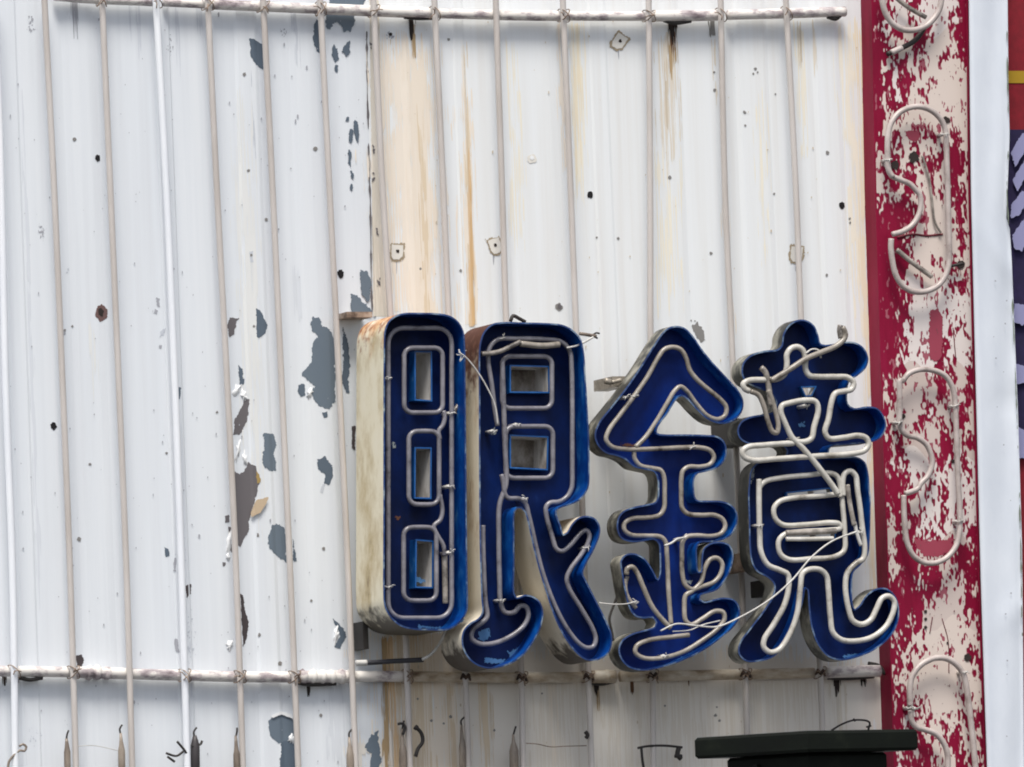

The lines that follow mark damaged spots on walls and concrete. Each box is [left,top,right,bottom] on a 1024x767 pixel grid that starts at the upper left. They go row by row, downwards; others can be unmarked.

peeling [249,38,263,69]
peeling [313,0,365,72]
rust [663,21,692,79]
peeling [346,117,359,191]
rust [459,42,501,326]
peeling [256,308,268,338]
peeling [298,317,351,418]
peeling [873,0,984,767]
peeling [262,433,276,471]
peeling [317,456,333,493]
peeling [257,524,297,563]
peeling [268,711,295,767]